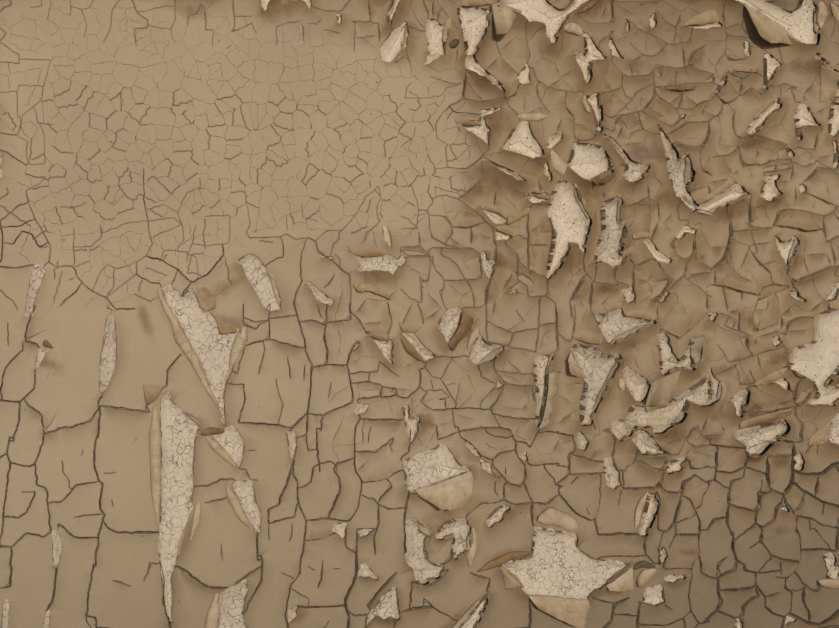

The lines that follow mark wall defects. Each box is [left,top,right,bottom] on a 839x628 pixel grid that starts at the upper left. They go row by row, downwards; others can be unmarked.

peeling [425,0,622,91]
peeling [727,0,839,168]
peeling [237,253,281,311]
peeling [478,93,648,279]
peeling [594,196,671,268]
peeling [568,286,792,455]
crack [561,0,839,376]
peeling [660,131,781,216]
peeling [754,283,839,445]
peeling [143,284,249,628]
peeling [402,440,685,628]
crack [595,374,839,628]